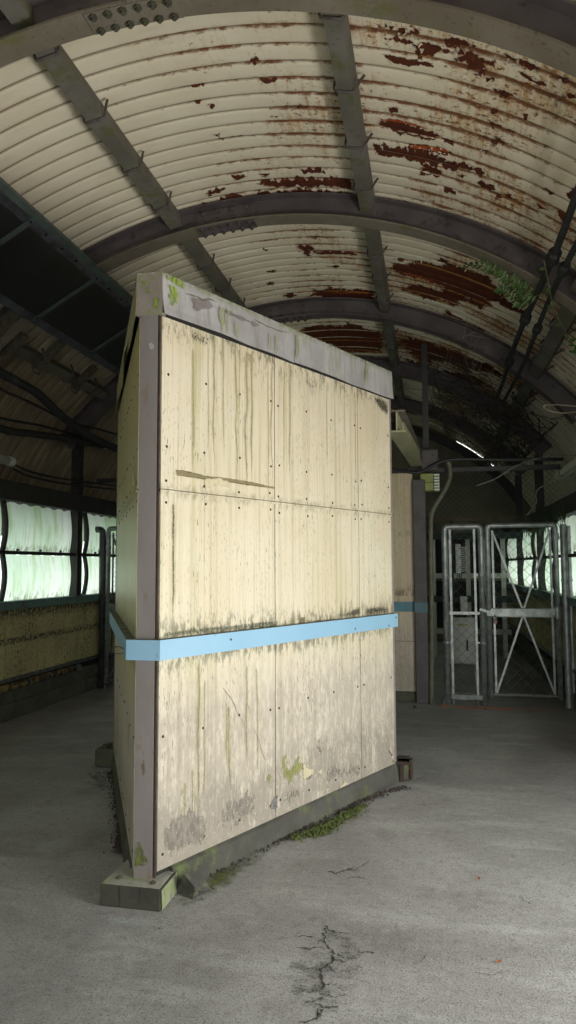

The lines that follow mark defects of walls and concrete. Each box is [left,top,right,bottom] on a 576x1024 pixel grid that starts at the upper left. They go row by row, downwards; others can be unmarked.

corrosion [382,24,576,154]
corrosion [373,107,512,199]
corrosion [202,167,354,204]
corrosion [295,236,357,269]
corrosion [283,285,376,300]
corrosion [387,258,527,332]
corrosion [299,322,384,354]
peeling [176,470,274,489]
damp [164,622,276,636]
damp [317,607,387,622]
peeling [270,729,378,810]
crack [292,925,374,1023]